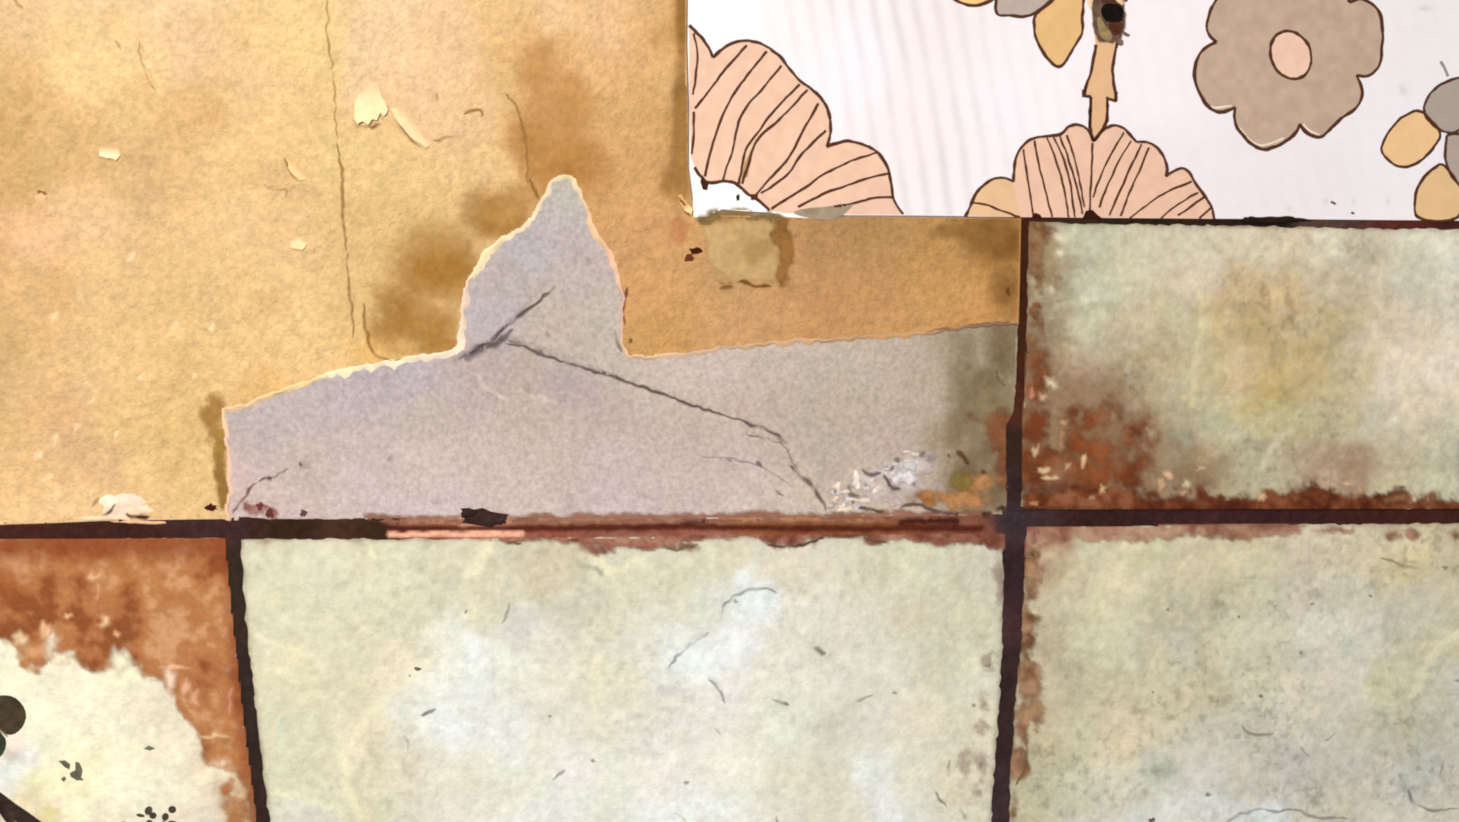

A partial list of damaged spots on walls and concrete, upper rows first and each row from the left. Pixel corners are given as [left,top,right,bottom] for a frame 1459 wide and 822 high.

crack [325,3,399,361]
peeling [354,82,439,148]
corrosion [365,514,464,524]
leakage [376,233,474,353]
leakage [475,195,526,236]
leakage [532,94,584,176]
peeling [222,174,1019,521]
crack [466,289,828,508]
corrosion [500,223,1459,779]
corrosion [0,538,256,822]